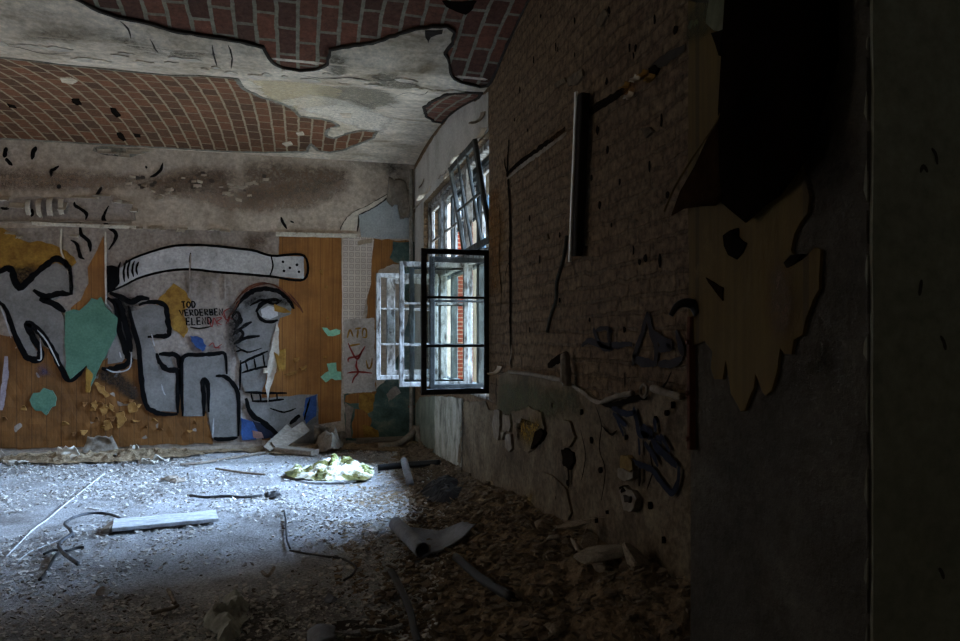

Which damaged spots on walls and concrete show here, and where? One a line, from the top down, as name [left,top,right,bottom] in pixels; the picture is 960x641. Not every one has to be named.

spalling [0,0,530,158]
leakage [0,164,347,212]
peeling [340,149,463,246]
peeling [487,351,684,488]
spalling [617,455,653,512]